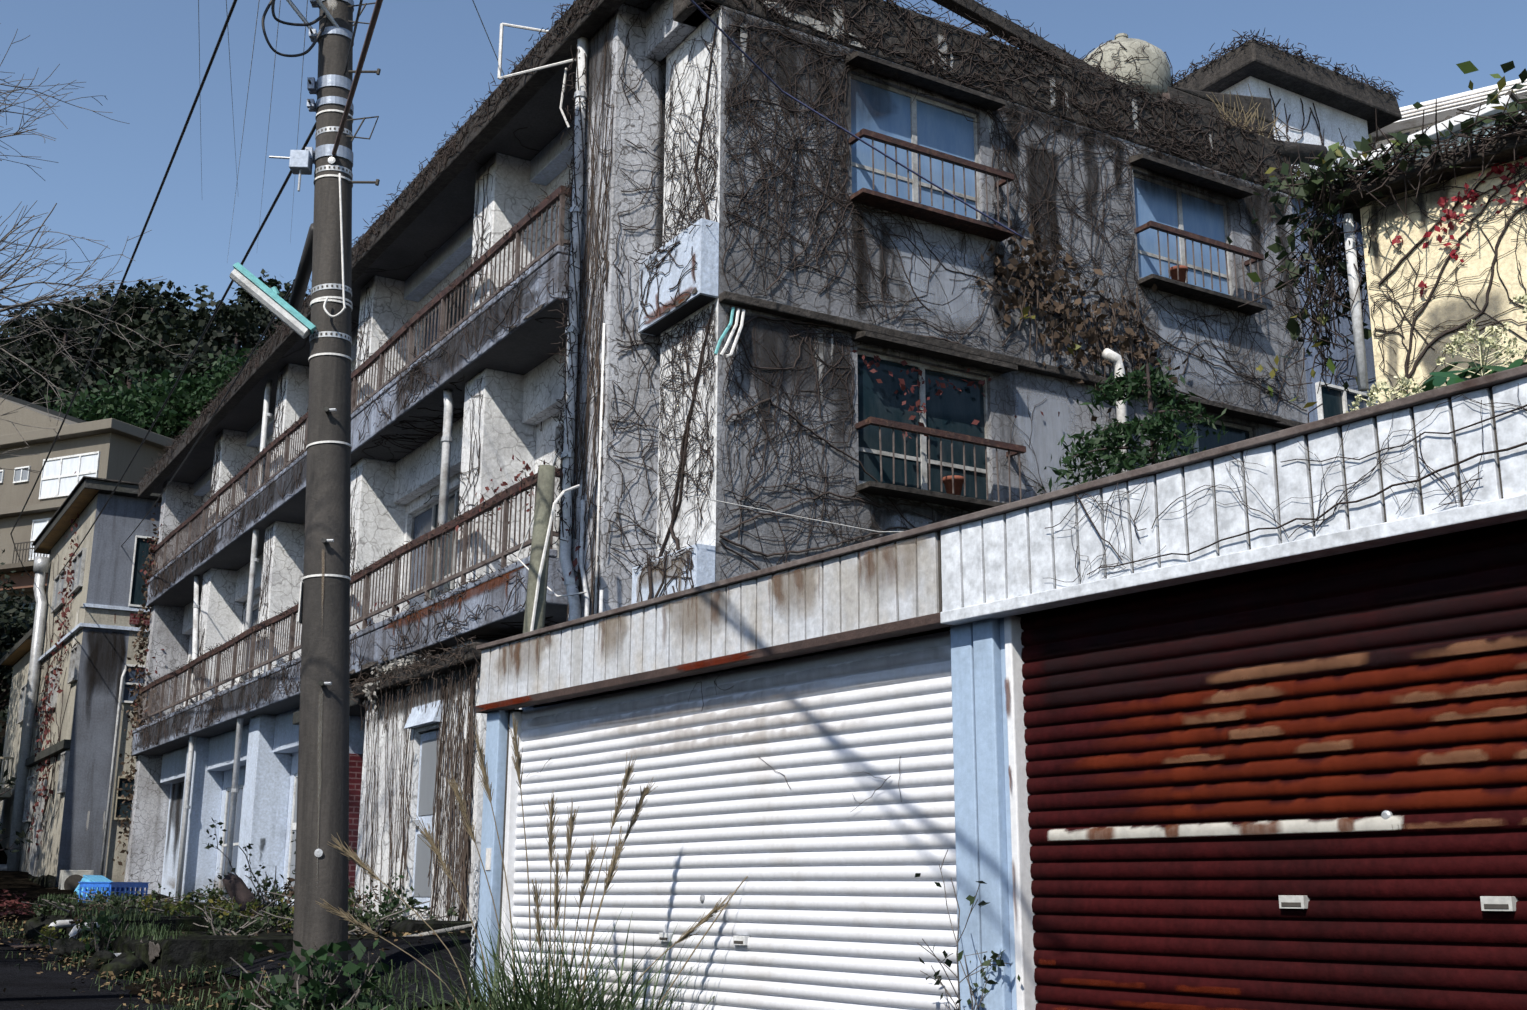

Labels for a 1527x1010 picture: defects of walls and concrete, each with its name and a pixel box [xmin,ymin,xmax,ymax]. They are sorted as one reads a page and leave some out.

leakage [938,37,953,67]
leakage [987,80,1291,302]
leakage [852,209,890,311]
corrosion [643,549,719,625]
leakage [86,631,125,704]
peeling [1186,653,1364,739]
corrosion [1082,655,1527,818]
peeling [1420,750,1487,764]
peeling [1397,680,1527,721]
peeling [1437,638,1527,656]
peeling [1049,816,1501,840]
corrosion [1039,959,1243,1010]